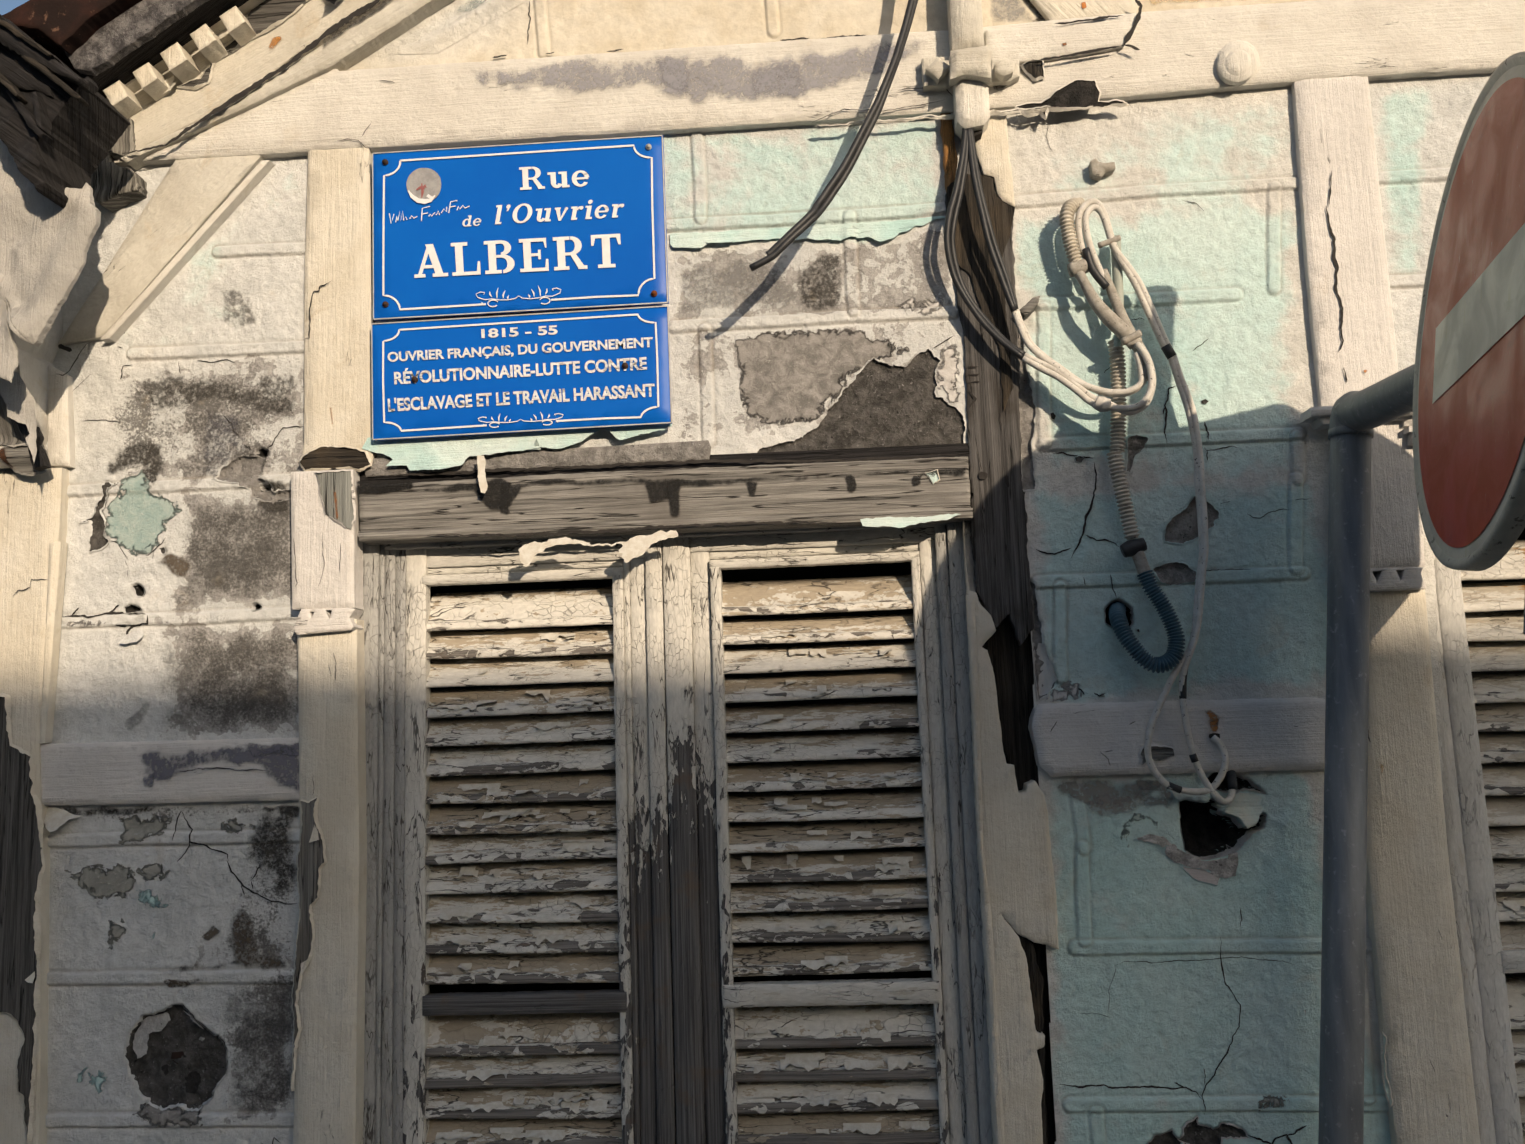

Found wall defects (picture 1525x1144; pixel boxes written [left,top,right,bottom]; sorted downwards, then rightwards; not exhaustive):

leakage [479,44,917,102]
crack [1326,171,1347,383]
spalling [735,328,967,453]
peeling [79,470,182,556]
leakage [256,481,289,512]
leakage [161,554,189,576]
crack [176,766,266,774]
crack [172,811,297,905]
peeling [0,693,81,1144]
crack [1060,908,1294,1111]
spalling [123,1004,228,1128]
spalling [1148,1115,1249,1144]